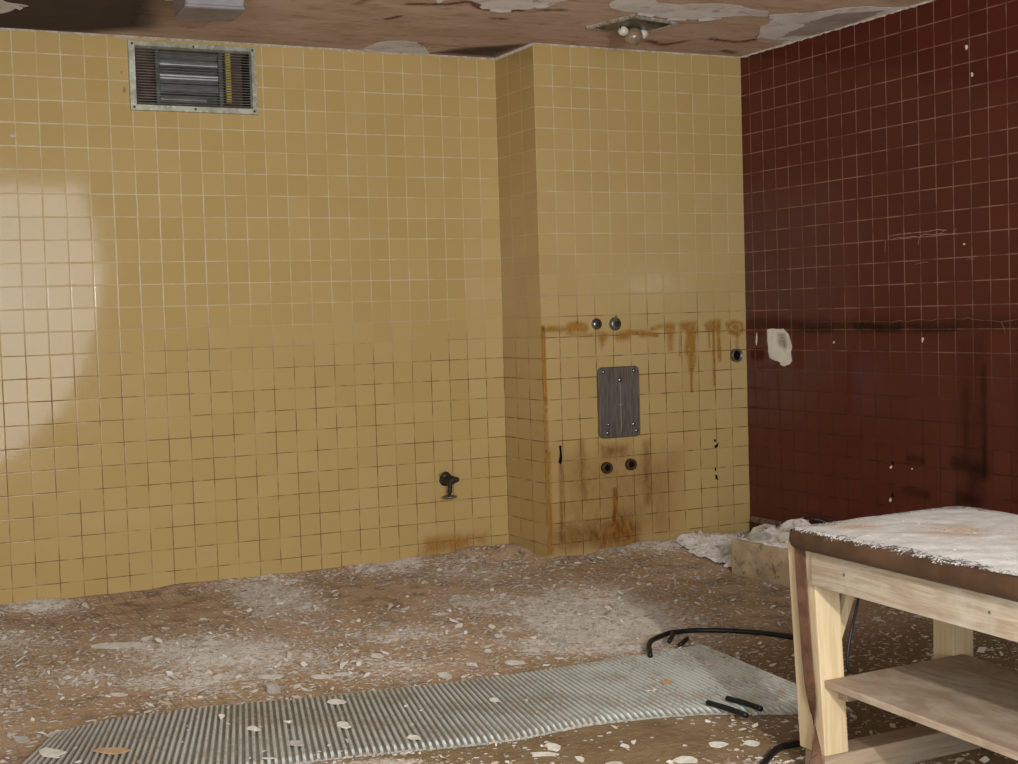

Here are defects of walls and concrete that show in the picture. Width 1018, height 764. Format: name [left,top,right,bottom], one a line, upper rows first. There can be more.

peeling [0,0,28,14]
peeling [468,0,566,13]
peeling [609,0,907,45]
peeling [359,41,430,56]
rust [620,323,695,392]
rust [541,322,587,554]
rust [602,488,635,545]